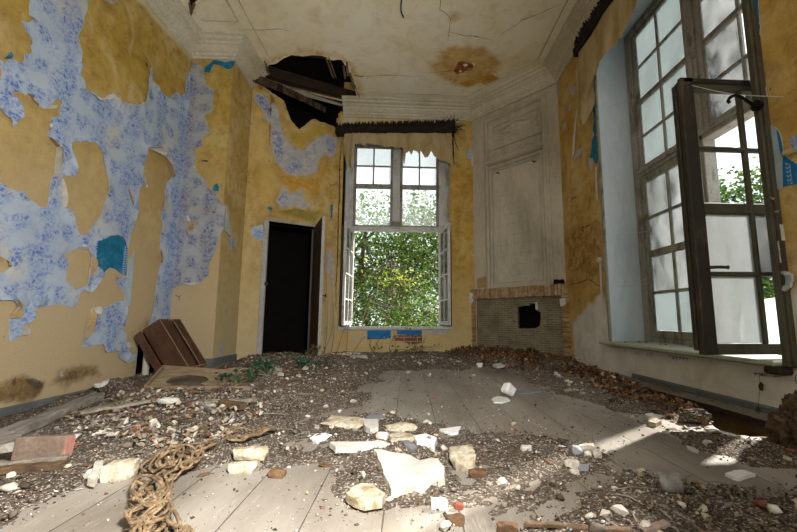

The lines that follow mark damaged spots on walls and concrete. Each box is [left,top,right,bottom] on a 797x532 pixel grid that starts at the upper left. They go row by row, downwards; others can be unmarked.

crack [439,0,563,40]
leakage [424,42,510,90]
peeling [272,129,304,173]
leakage [45,359,106,396]